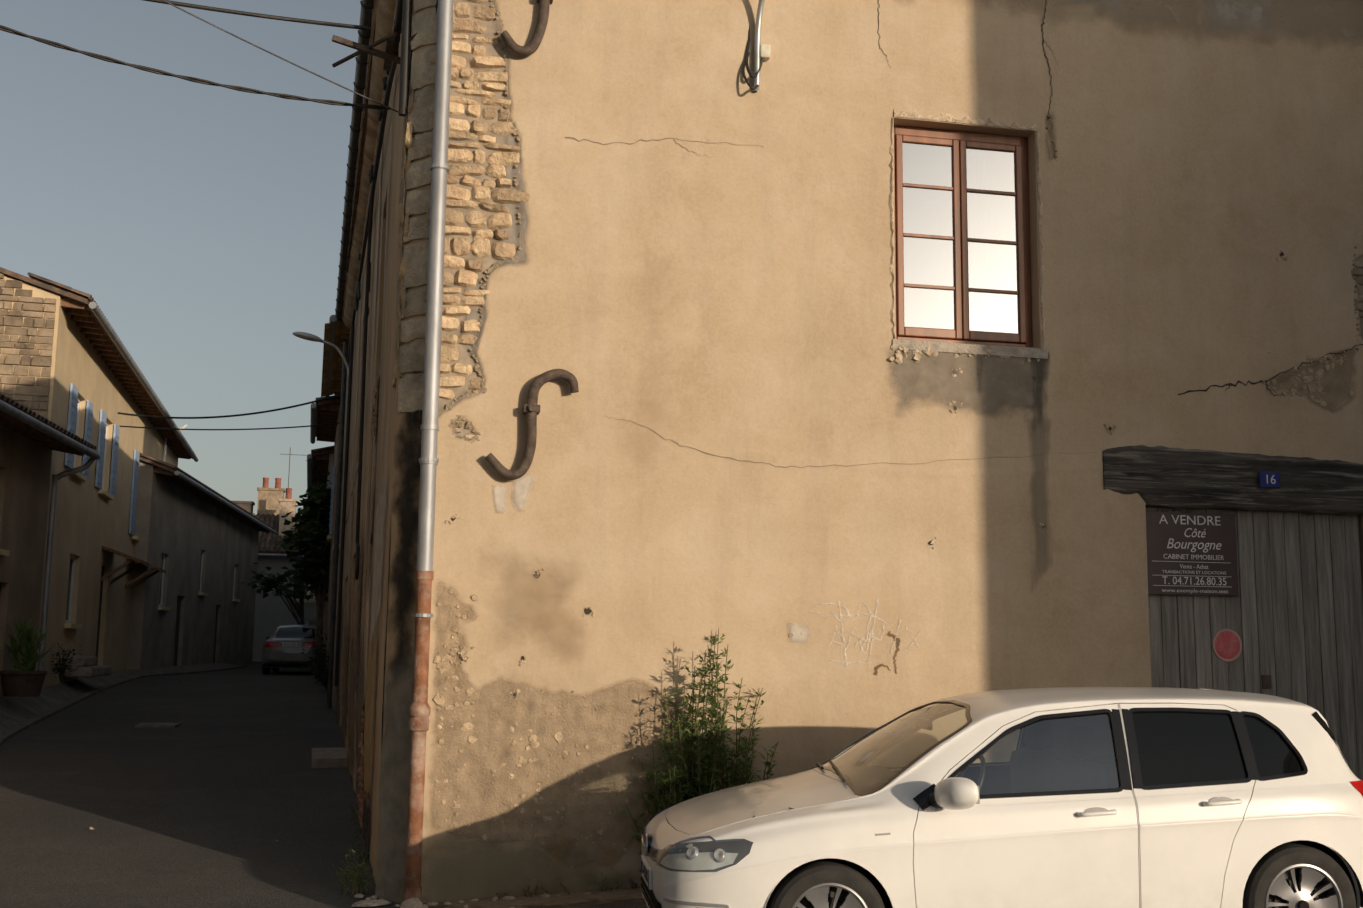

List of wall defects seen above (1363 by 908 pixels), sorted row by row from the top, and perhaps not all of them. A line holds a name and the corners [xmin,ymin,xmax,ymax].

damp [335,79,422,858]
flaking render [371,89,414,444]
flaking render [423,0,530,443]
crack [565,137,764,158]
crack [610,417,1050,468]
crack [1041,0,1057,161]
flaking render [1262,246,1363,412]
peeling [431,583,688,869]